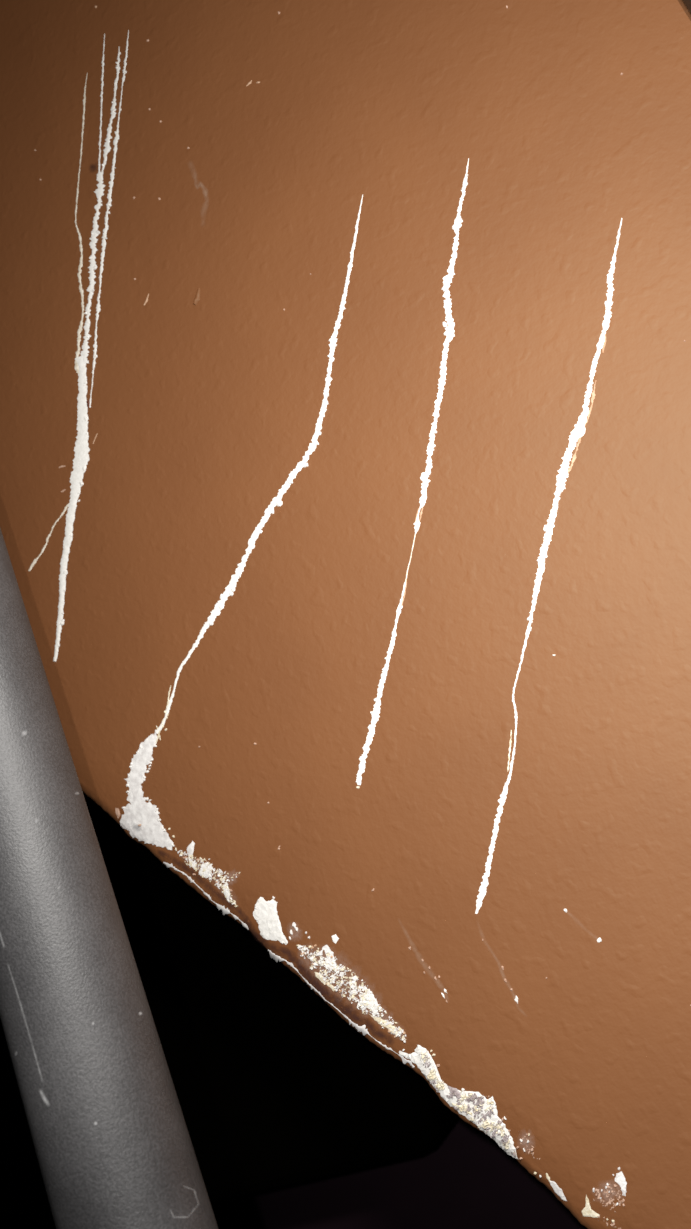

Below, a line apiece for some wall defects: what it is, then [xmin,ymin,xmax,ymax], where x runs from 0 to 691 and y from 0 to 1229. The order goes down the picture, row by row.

spalling [115,733,240,907]
spalling [249,896,567,1201]
peeling [582,1167,627,1229]